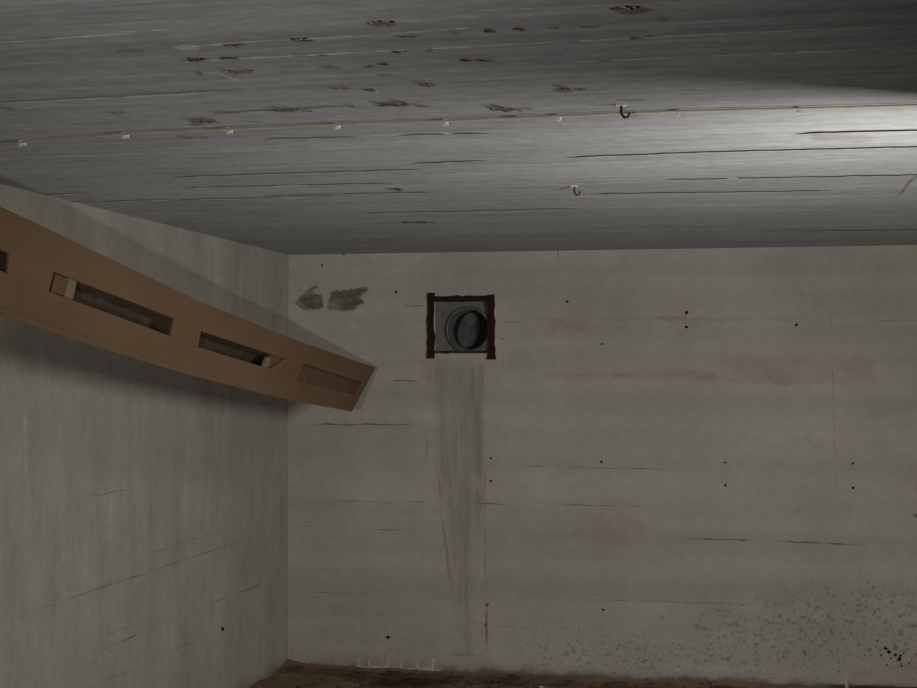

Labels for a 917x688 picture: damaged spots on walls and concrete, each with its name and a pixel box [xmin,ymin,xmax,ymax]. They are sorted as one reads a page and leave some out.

water stain [697,588,917,688]